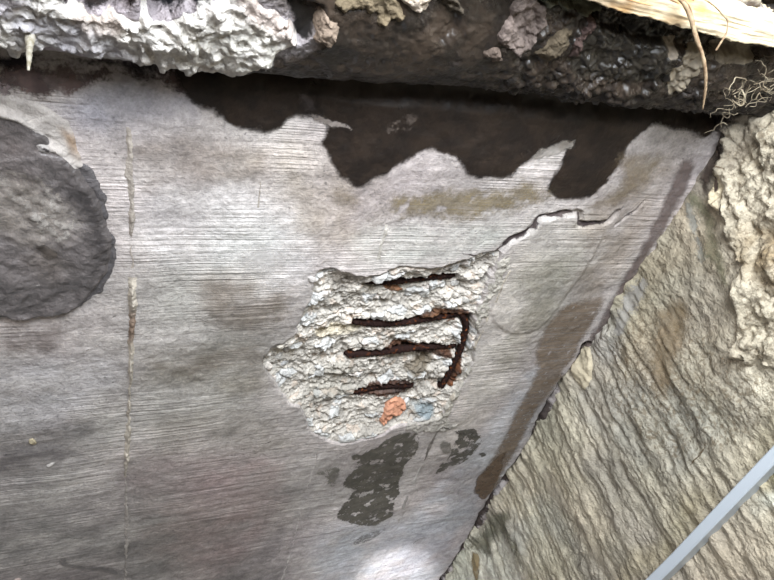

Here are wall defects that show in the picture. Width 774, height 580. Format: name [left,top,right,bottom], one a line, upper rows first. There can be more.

damp [0,0,774,199]
crack [496,207,638,250]
damp [37,245,58,260]
spalling [263,250,511,443]
corrosion [377,339,462,386]
corrosion [419,307,470,321]
damp [436,160,703,499]
corrosion [358,380,410,397]
damp [318,432,420,544]